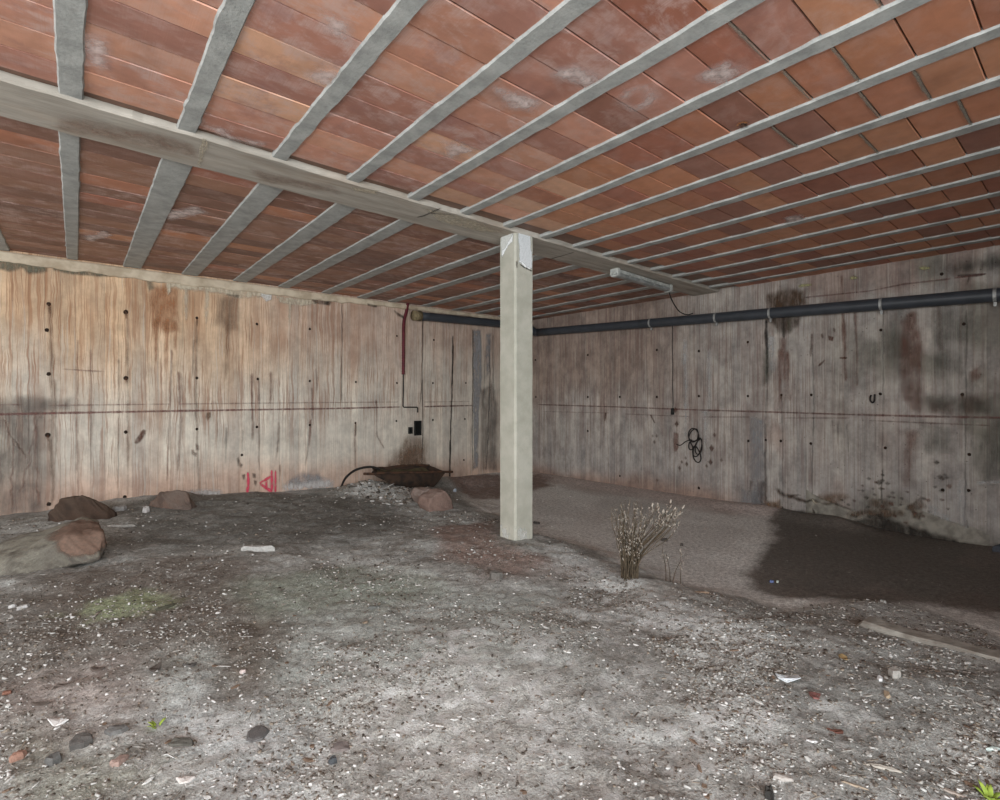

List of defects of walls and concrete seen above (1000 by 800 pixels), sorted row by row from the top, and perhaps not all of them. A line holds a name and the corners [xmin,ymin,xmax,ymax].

spalling [430,211,532,271]
water stain [768,290,805,345]
water stain [857,516,966,544]